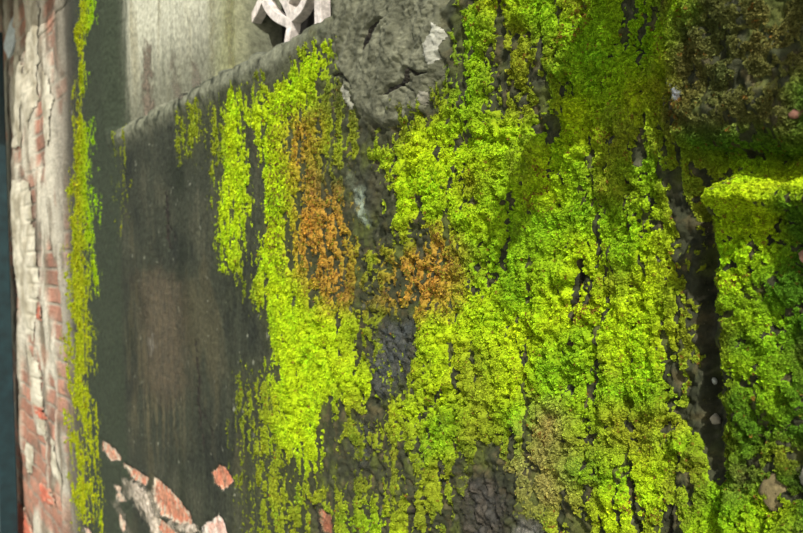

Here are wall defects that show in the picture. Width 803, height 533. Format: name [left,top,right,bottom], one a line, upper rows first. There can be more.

peeling [11,0,54,149]
peeling [8,180,62,507]
spalling [17,494,33,533]
spalling [102,441,227,533]
spalling [212,465,234,490]